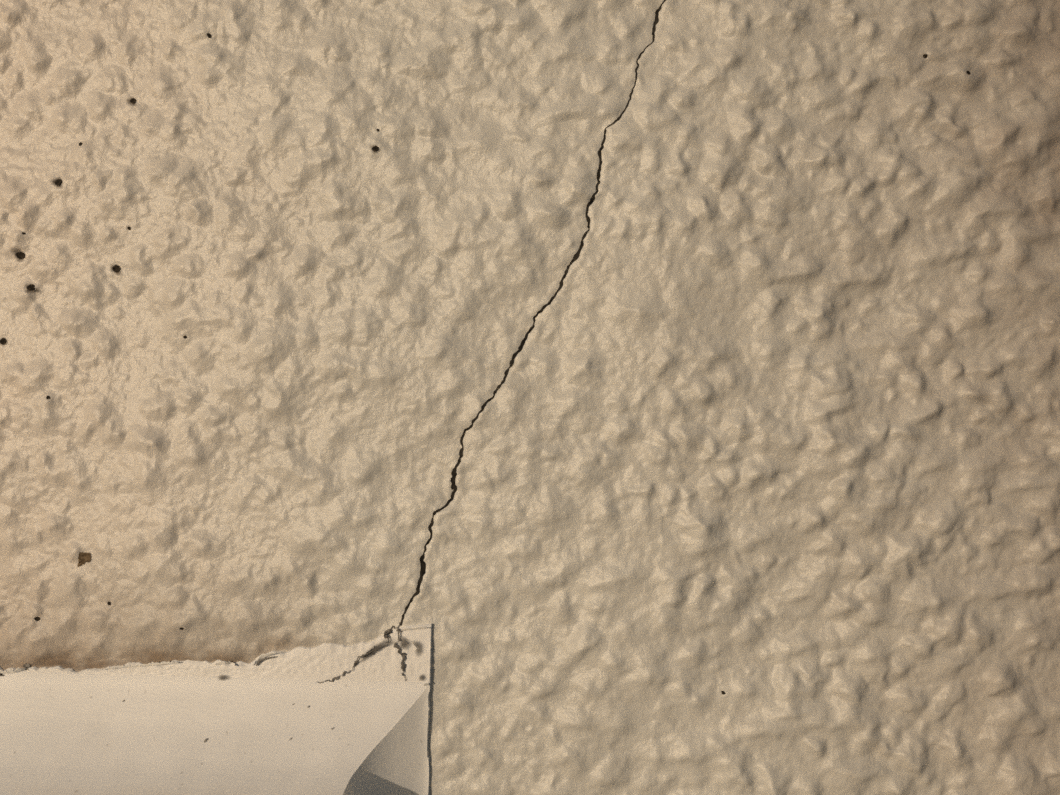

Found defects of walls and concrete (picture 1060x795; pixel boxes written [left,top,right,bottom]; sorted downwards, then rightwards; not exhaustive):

crack [316,0,666,683]
peeling [364,626,427,659]
peeling [0,664,30,676]
peeling [254,653,277,666]